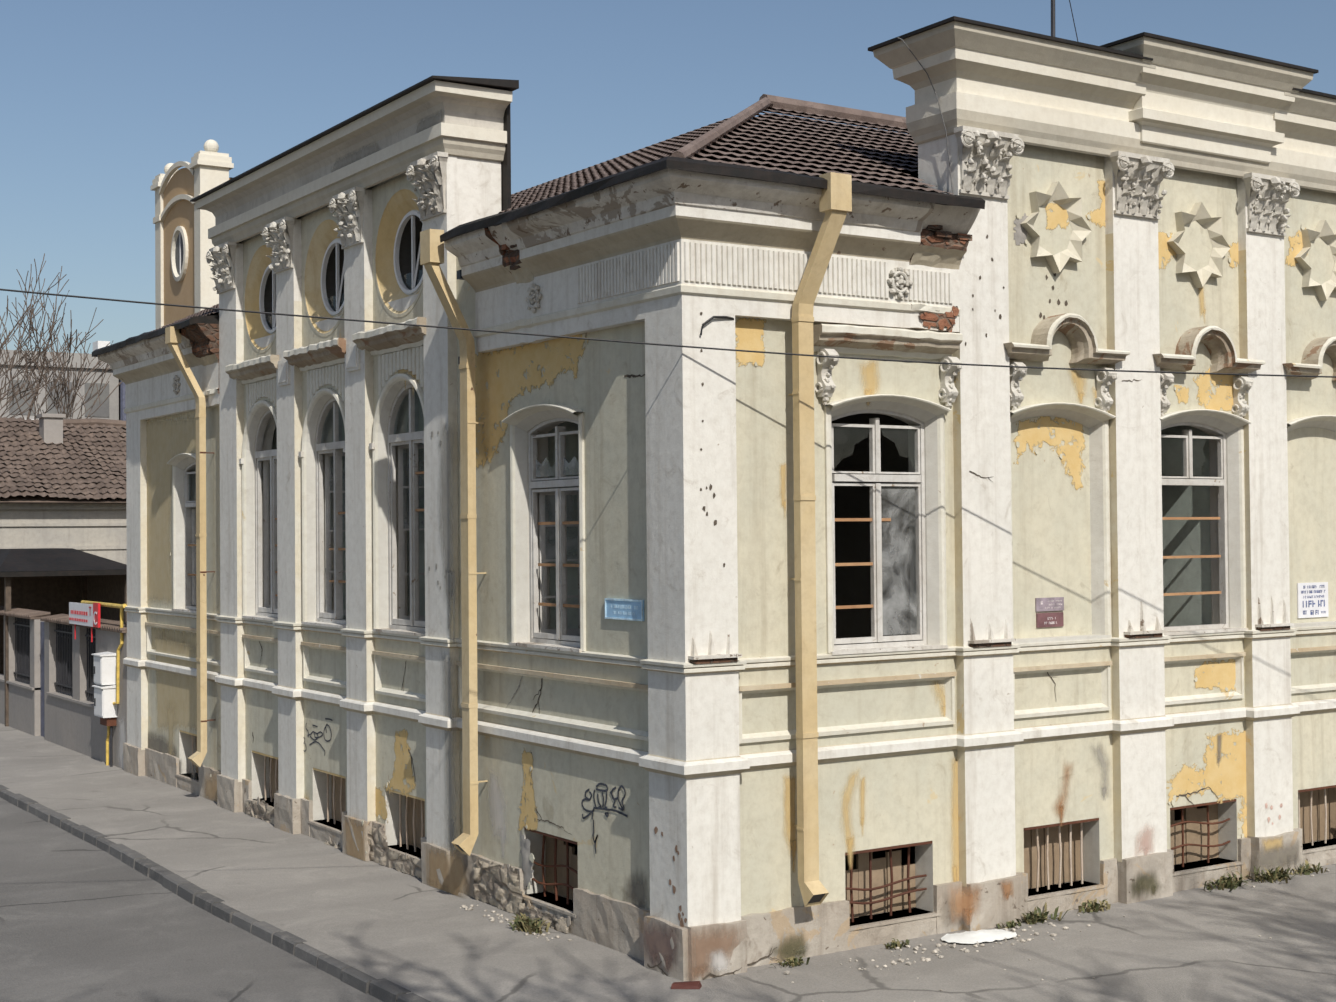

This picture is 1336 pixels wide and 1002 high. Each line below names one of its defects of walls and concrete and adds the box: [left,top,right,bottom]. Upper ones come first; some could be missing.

peeling [475,333,589,468]
peeling [1013,416,1086,490]
flaking render [367,729,422,879]
flaking render [472,749,571,933]
peeling [1166,728,1247,838]